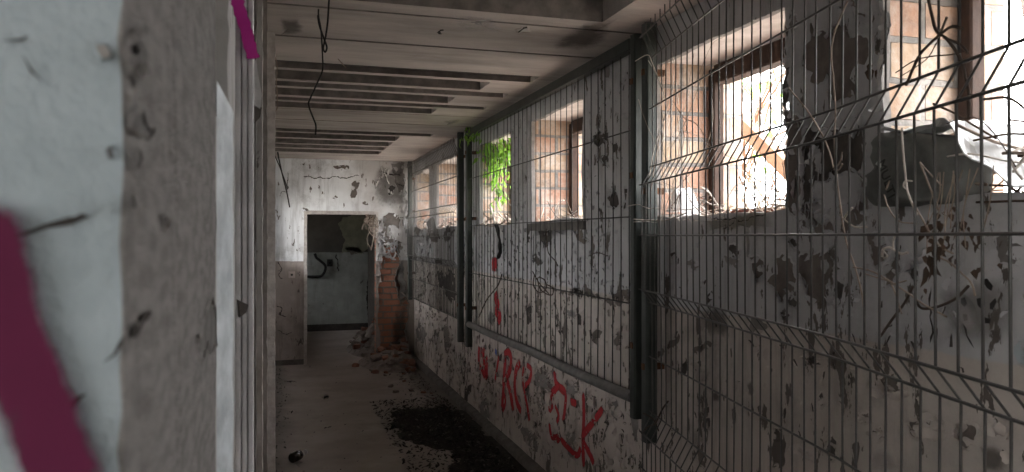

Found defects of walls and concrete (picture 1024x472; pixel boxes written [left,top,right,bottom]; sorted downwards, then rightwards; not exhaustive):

crack [280,175,359,196]
peeling [332,71,642,472]
peeling [696,0,932,320]